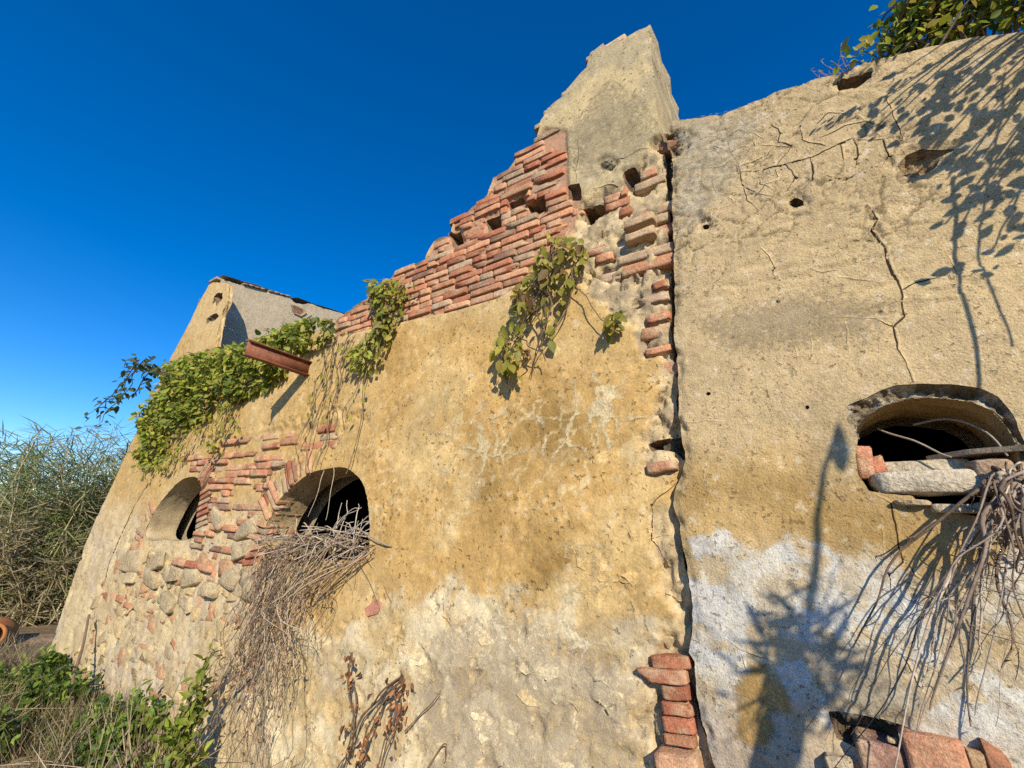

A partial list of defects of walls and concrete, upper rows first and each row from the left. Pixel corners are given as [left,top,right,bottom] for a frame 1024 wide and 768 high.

spalling [837,71,872,91]
spalling [568,183,582,201]
spalling [600,160,641,192]
crack [575,94,920,242]
spalling [898,149,954,178]
crack [668,271,676,312]
crack [787,204,962,382]
leakage [530,371,646,461]
leakage [429,402,527,500]